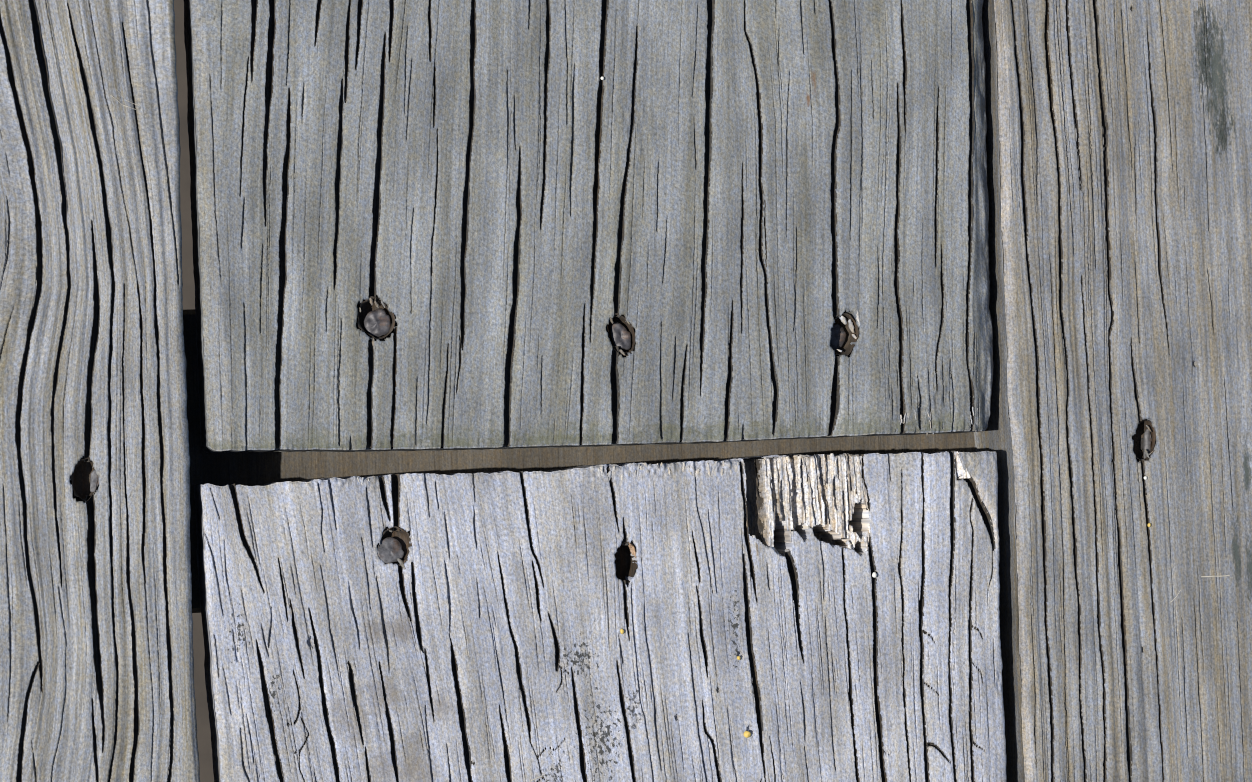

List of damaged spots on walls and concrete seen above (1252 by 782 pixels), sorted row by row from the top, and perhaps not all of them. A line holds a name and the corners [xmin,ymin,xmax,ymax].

crack [828,0,841,317]
spalling [743,453,871,556]
crack [828,356,840,436]
crack [842,0,996,782]